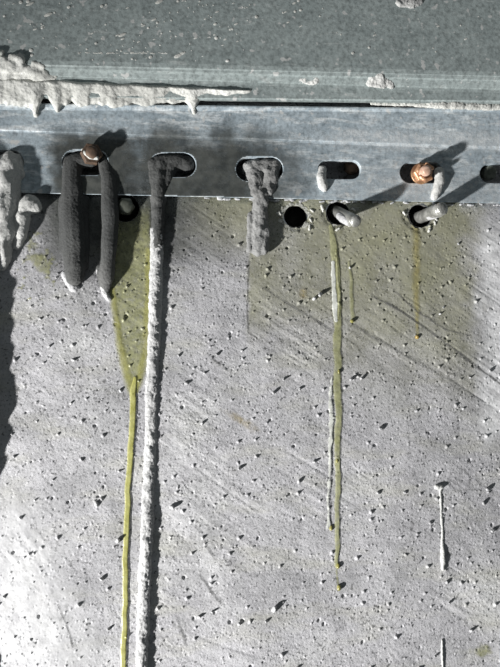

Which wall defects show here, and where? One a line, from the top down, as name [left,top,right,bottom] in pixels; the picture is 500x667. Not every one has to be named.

leakage [45,194,61,249]
leakage [87,194,102,255]
leakage [163,196,211,252]
leakage [281,199,468,591]
leakage [111,195,152,667]